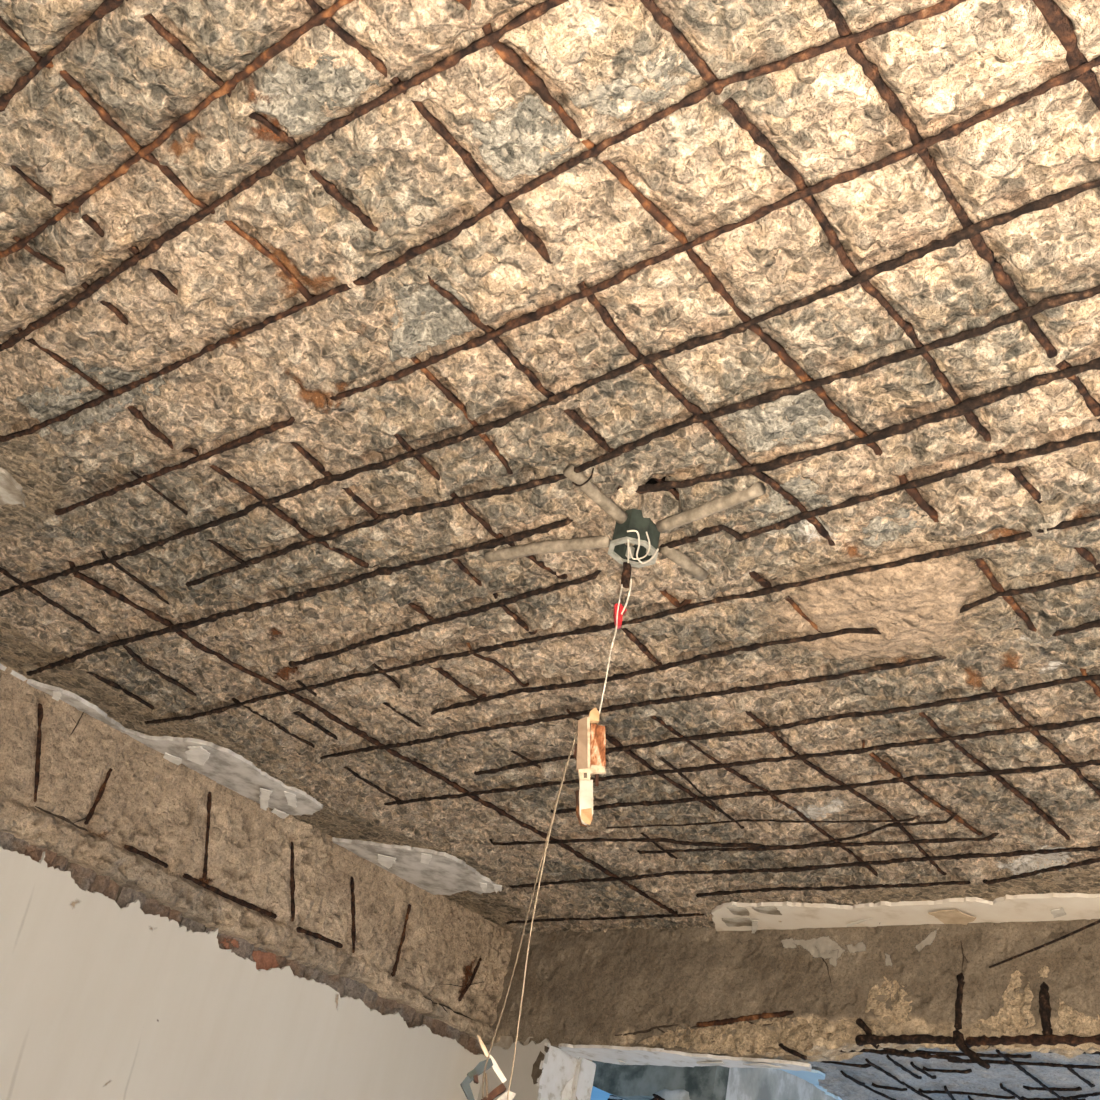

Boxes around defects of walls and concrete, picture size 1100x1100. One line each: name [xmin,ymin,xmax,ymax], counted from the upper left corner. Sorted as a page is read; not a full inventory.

rust [249,81,285,142]
spalling [251,55,380,135]
rust [171,132,202,162]
rust [271,247,335,298]
spalling [388,280,476,361]
spalling [17,357,167,437]
rust [285,368,347,413]
spalling [727,376,849,452]
rust [271,666,299,680]
rust [965,667,983,688]
peeling [0,663,323,819]
peeling [711,893,1100,933]